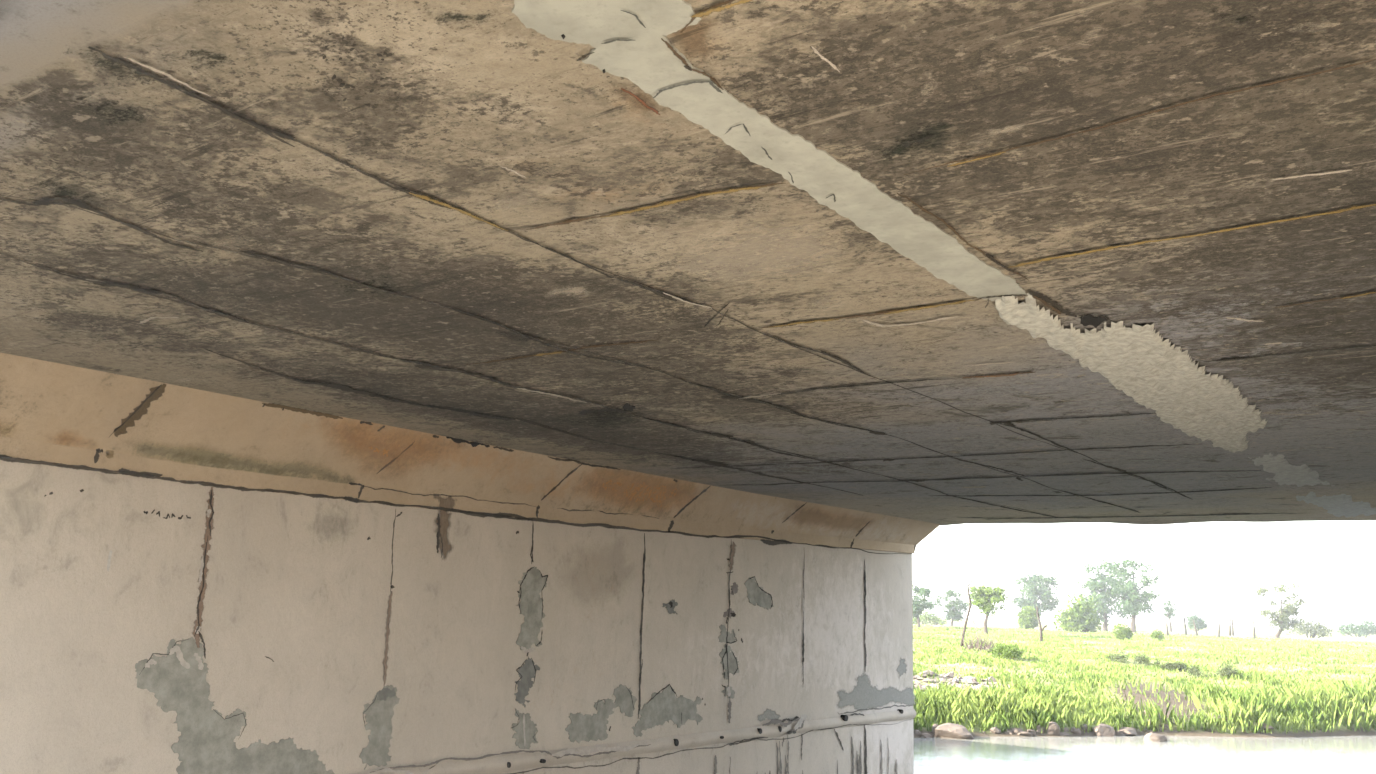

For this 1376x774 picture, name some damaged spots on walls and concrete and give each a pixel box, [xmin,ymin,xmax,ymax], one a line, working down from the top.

water stain [77,98,142,126]
water stain [164,49,227,68]
crack [577,0,752,98]
crack [88,47,794,328]
crack [689,59,1376,435]
crack [285,308,655,431]
peeling [135,637,335,774]
peeling [359,685,400,770]
peeling [511,567,548,750]
peeling [565,684,706,744]
crack [0,384,1293,774]
peeling [718,576,774,699]